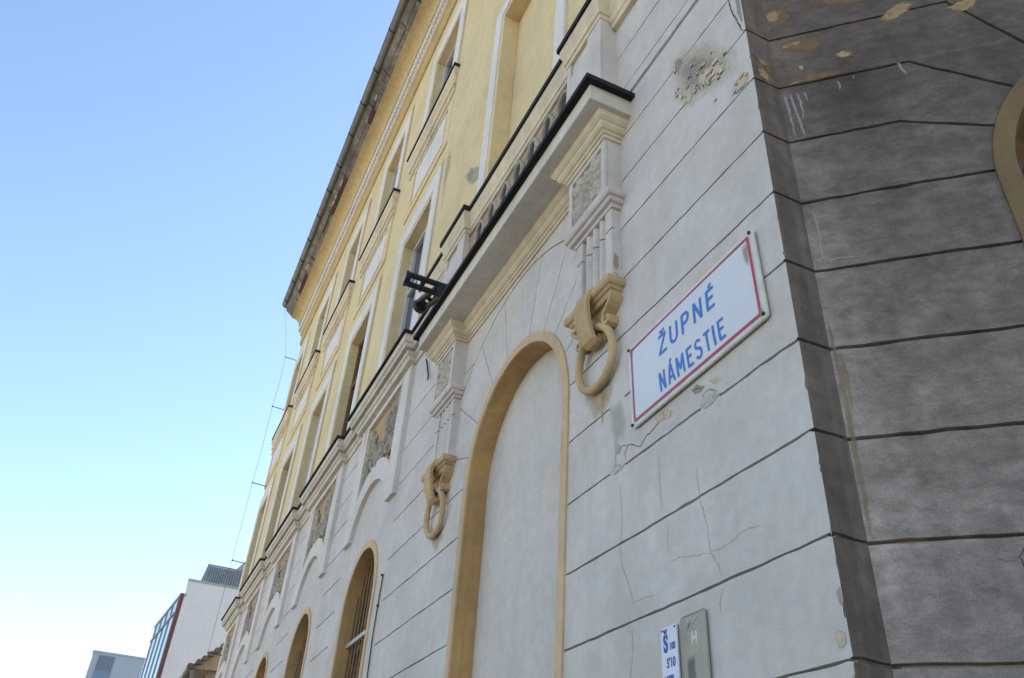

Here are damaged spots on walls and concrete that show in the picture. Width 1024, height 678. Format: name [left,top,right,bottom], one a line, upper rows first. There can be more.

flaking render [883,3,911,20]
flaking render [948,0,975,11]
flaking render [834,50,854,58]
peeling [673,51,725,104]
crack [614,424,758,613]